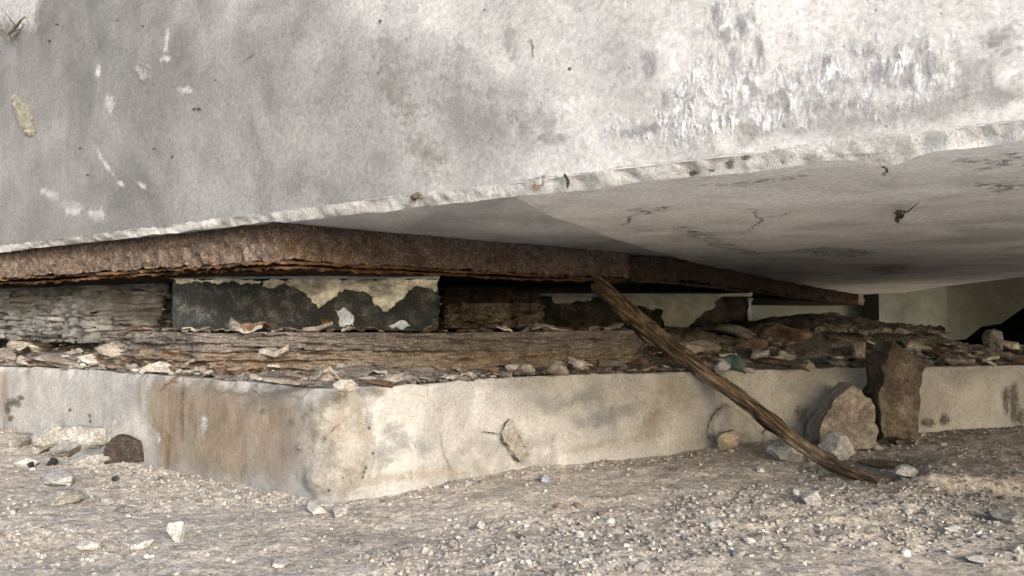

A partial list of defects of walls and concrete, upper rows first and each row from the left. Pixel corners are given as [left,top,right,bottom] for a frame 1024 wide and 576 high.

corrosion [0,261,863,306]
leakage [1004,383,1024,424]
crack [482,418,526,462]